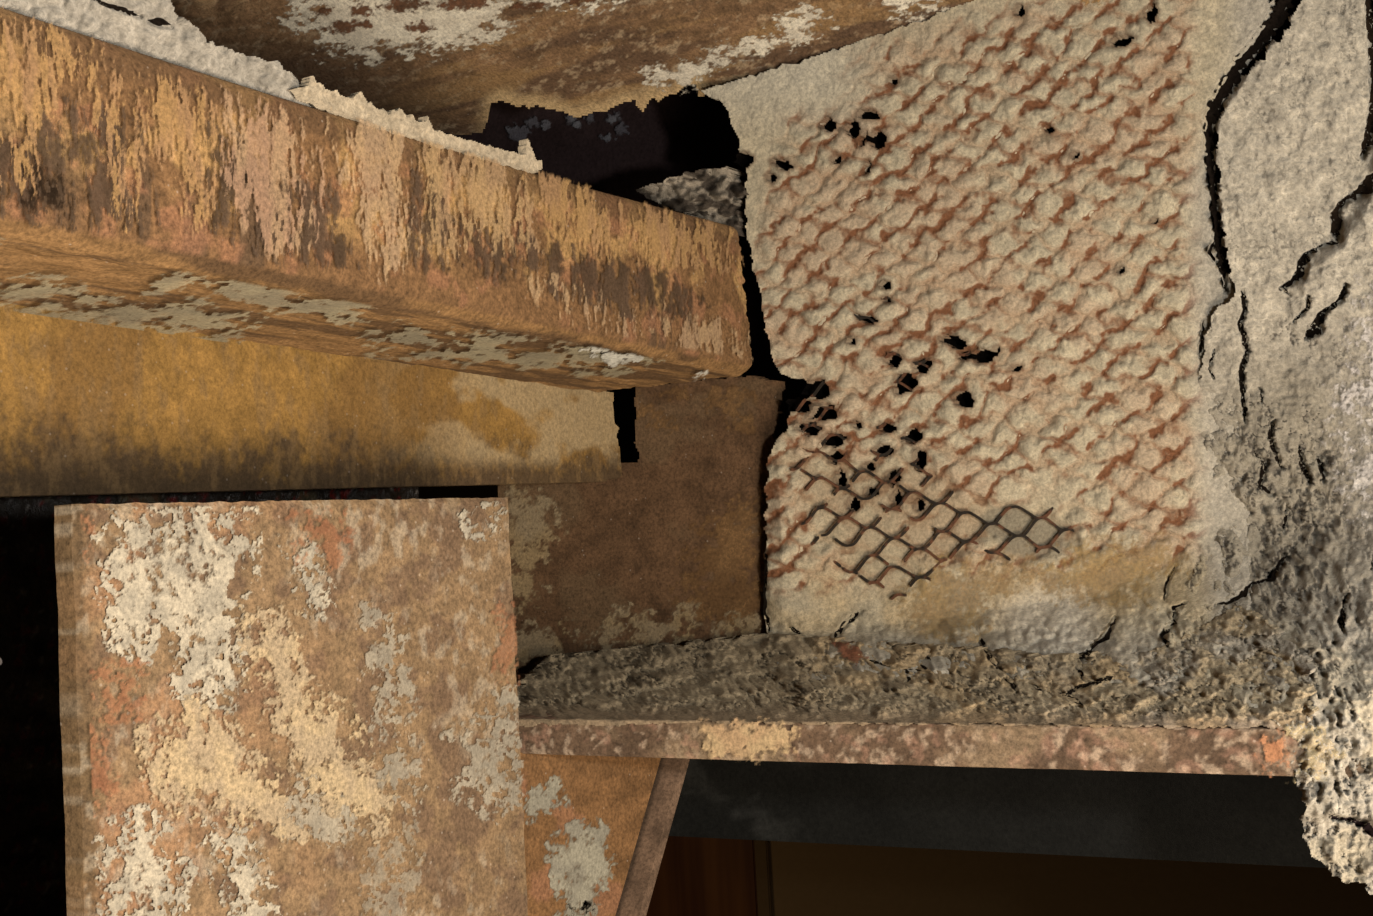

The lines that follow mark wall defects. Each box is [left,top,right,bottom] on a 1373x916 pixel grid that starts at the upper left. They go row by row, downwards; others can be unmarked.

rust [318,0,488,35]
peeling [276,0,627,67]
peeling [638,2,840,93]
rust [0,20,750,357]
crack [1280,0,1373,339]
peeling [0,272,662,378]
crack [1199,0,1326,605]
flaking render [786,380,927,512]
rust [491,602,517,673]
crack [1338,596,1346,632]
rust [1254,731,1296,778]
crack [1329,814,1373,837]